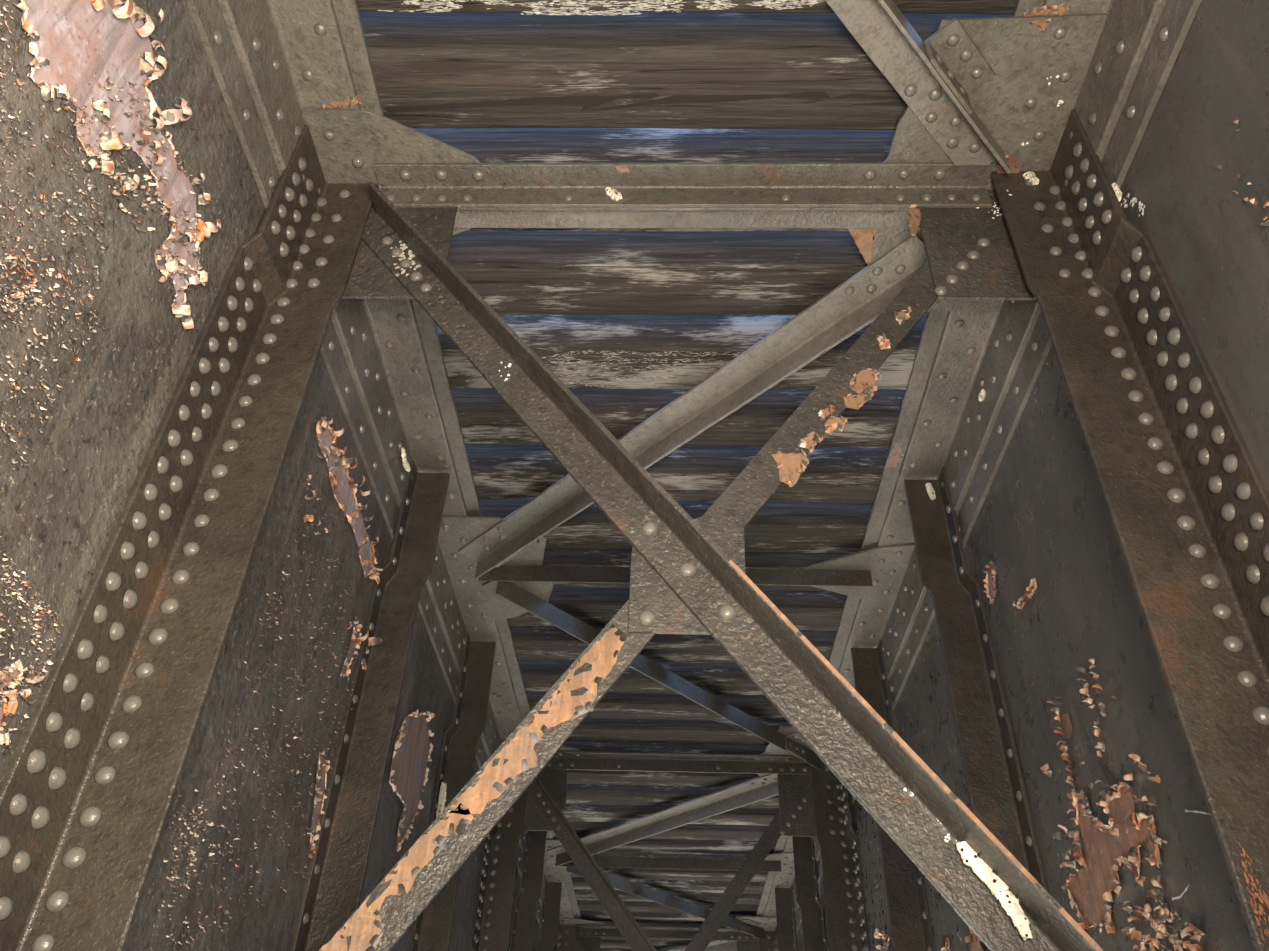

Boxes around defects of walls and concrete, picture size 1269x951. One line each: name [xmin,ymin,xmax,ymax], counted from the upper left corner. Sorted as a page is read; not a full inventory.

peeling [0,0,221,472]
rust [771,368,882,487]
rust [877,333,890,350]
rust [894,306,911,325]
peeling [0,536,64,745]
peeling [148,416,383,951]
peeling [388,709,435,852]
rust [319,624,628,951]
peeling [1041,658,1168,933]
peeling [941,928,984,951]